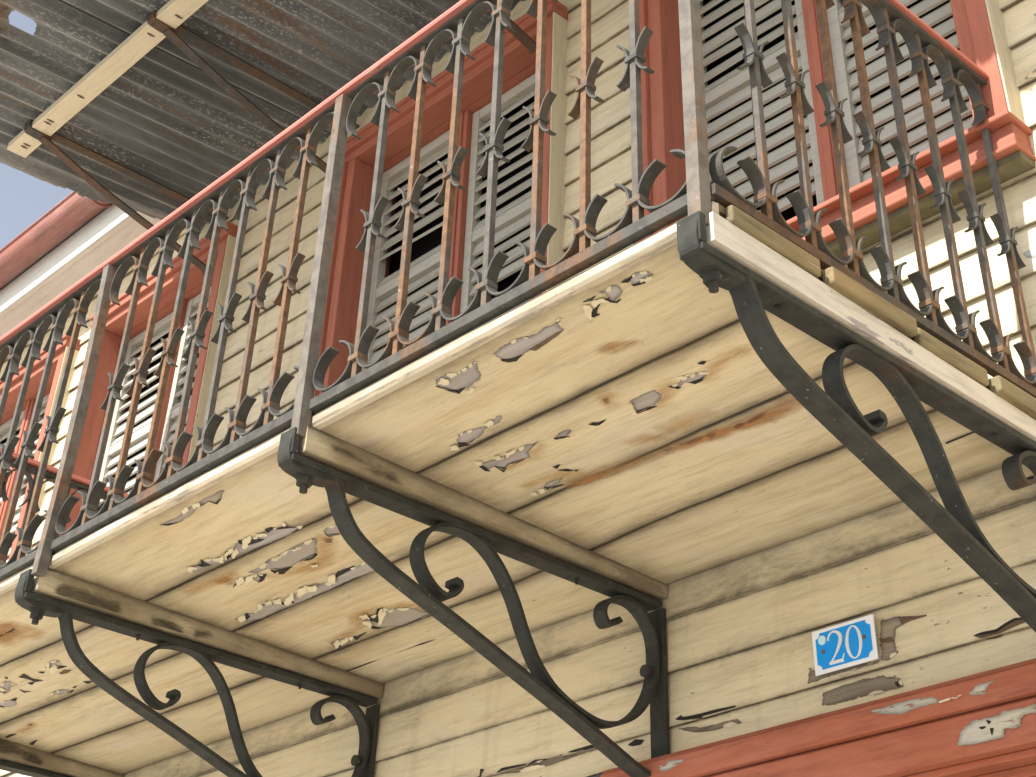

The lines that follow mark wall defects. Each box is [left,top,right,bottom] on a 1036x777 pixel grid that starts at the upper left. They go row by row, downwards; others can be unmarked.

peeling [493,316,564,363]
peeling [435,361,481,394]
peeling [627,361,708,415]
rust [674,399,796,450]
rust [559,461,638,486]
peeling [186,522,341,587]
peeling [235,562,374,622]
peeling [330,608,430,649]
peeling [0,660,71,708]
peeling [807,615,926,705]
peeling [870,680,994,714]
peeling [957,704,1036,746]